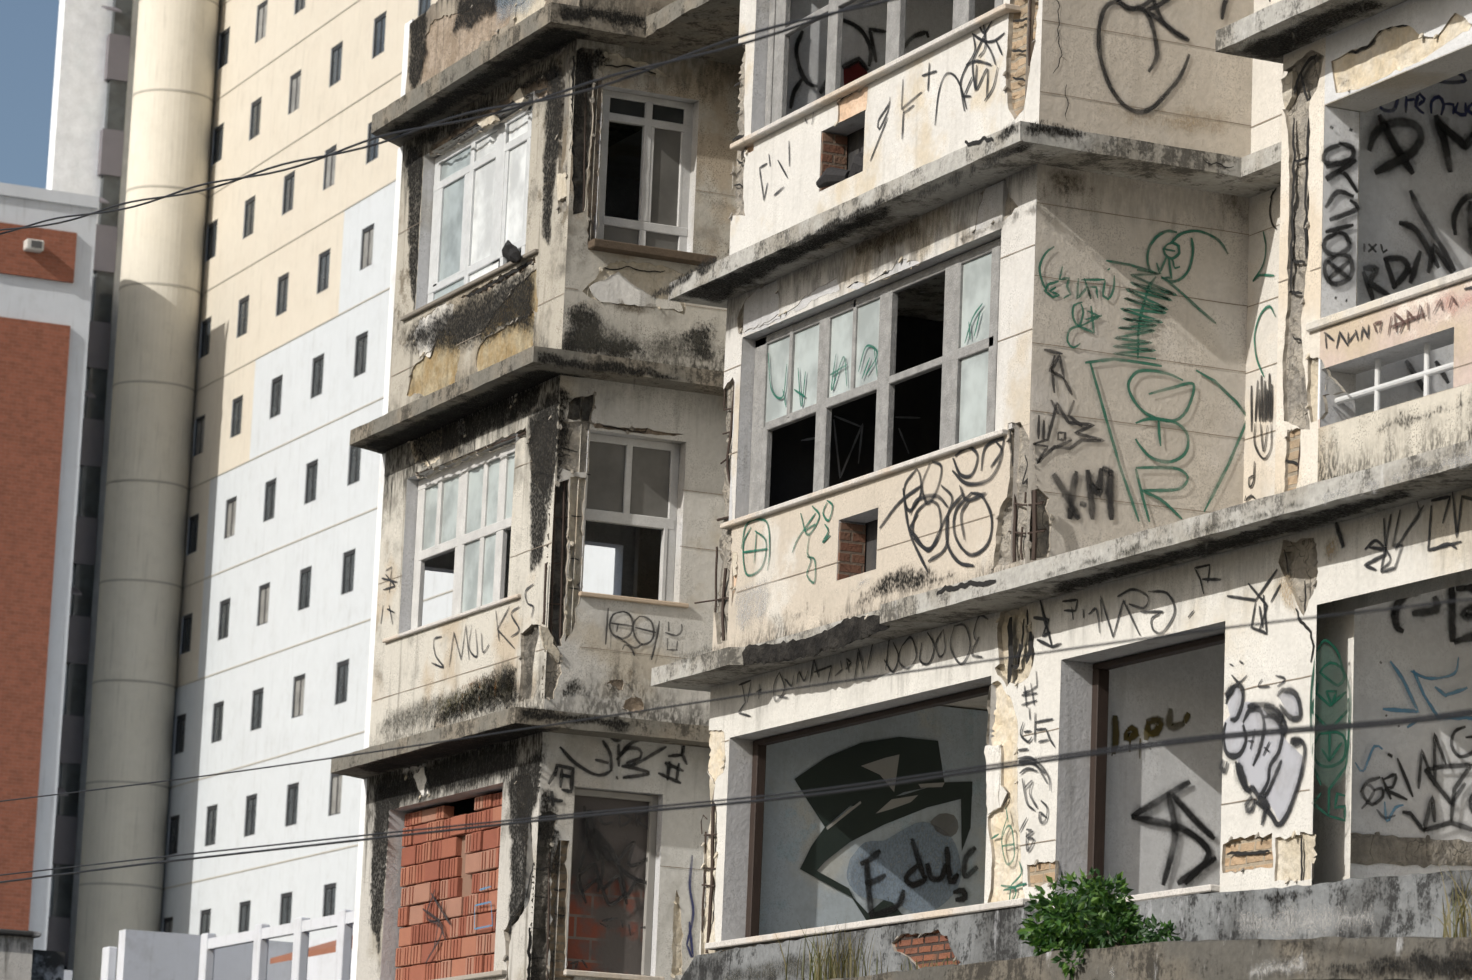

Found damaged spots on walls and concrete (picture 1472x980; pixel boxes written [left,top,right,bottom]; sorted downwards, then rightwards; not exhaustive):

water stain [387,0,643,353]
flaking render [582,261,686,315]
water stain [616,120,1085,312]
spalling [1281,13,1472,492]
water stain [362,304,713,571]
spalling [1278,538,1318,616]
water stain [359,666,630,952]
spalling [1222,830,1317,884]
water stain [527,942,557,980]
spalling [892,929,961,969]
water stain [1243,889,1367,936]
water stain [1326,948,1472,976]